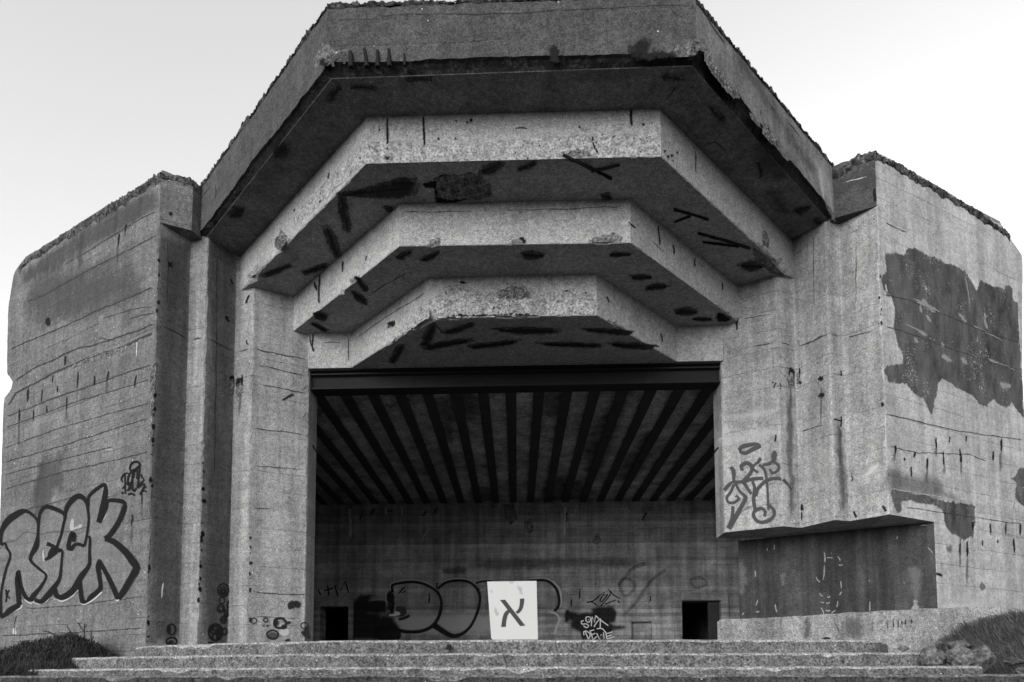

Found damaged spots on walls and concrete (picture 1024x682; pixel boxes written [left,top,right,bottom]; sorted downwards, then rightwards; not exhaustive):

spalling [274,123,678,250]
water stain [891,488,941,512]